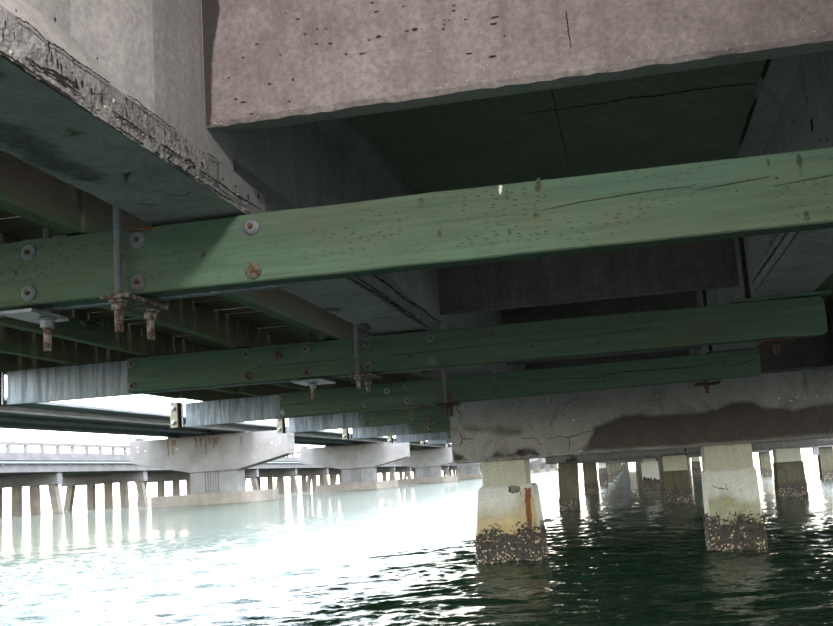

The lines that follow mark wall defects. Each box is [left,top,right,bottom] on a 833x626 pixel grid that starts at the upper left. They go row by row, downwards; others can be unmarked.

spalling [0,5,224,197]
crack [519,84,750,164]
spalling [348,275,441,331]
crack [525,425,590,450]
water stain [582,402,833,457]